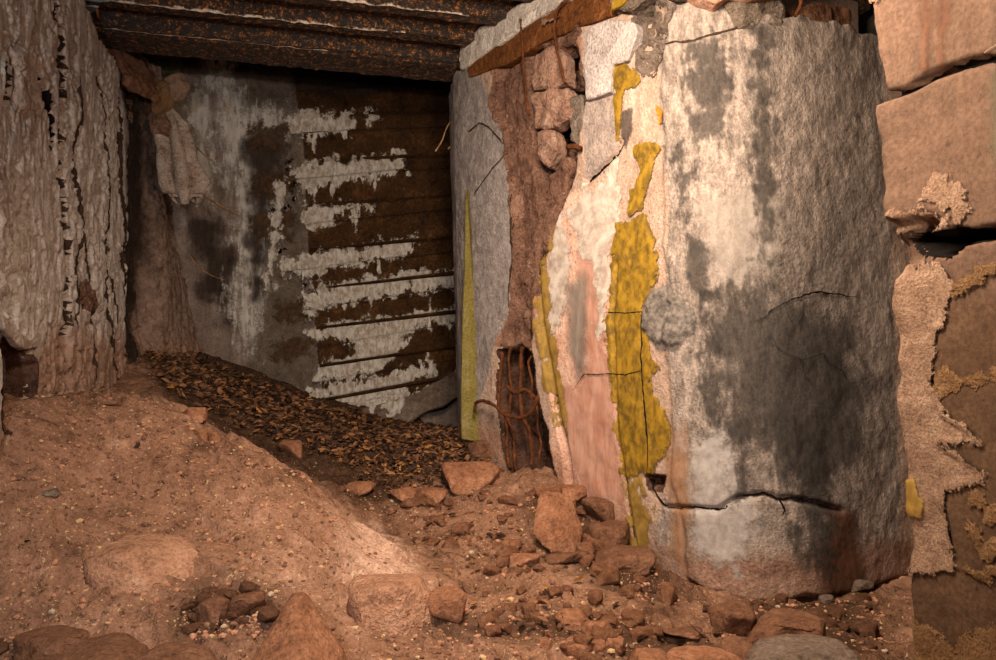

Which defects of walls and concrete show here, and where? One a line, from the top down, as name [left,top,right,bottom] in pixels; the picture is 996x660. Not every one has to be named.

spalling [77,279,99,310]
leakage [185,60,456,417]
spalling [488,49,568,473]
spalling [571,38,588,107]
leakage [669,139,697,223]
crack [554,311,838,537]
leakage [686,235,751,503]
leakage [744,25,779,266]
crack [768,291,859,315]
spalling [892,258,996,587]
crack [898,57,996,98]
crack [907,226,996,258]